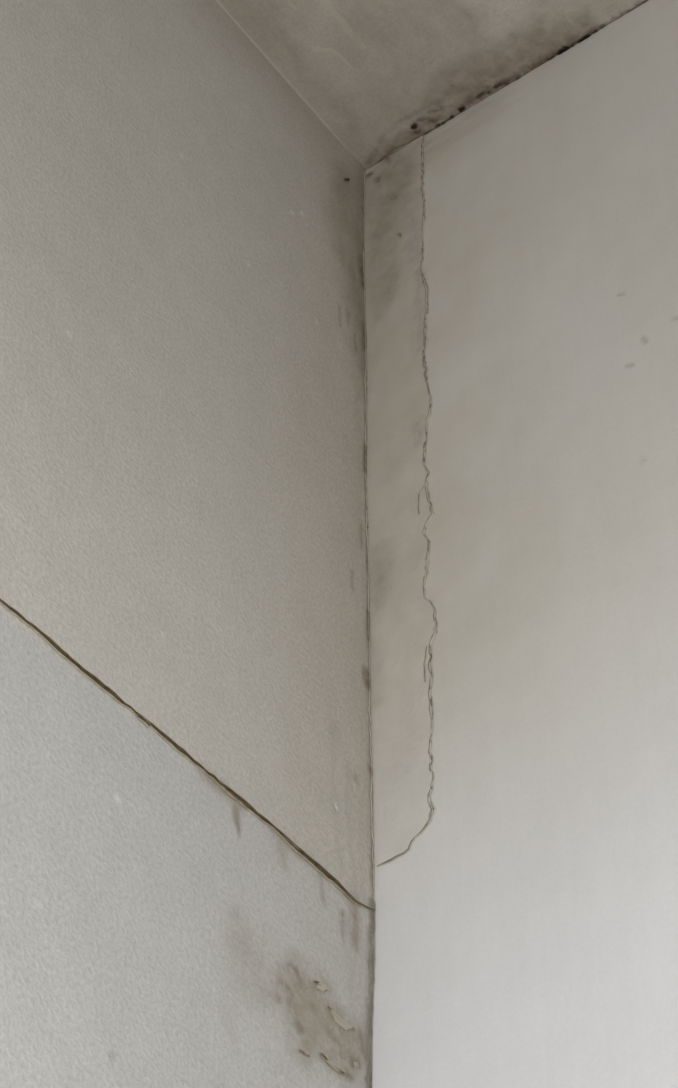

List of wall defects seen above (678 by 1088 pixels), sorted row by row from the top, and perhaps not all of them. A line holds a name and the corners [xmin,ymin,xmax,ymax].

water stain [537,25,604,64]
crack [363,0,648,889]
crack [0,598,375,931]
crack [367,958,375,986]
crack [365,1022,373,1086]